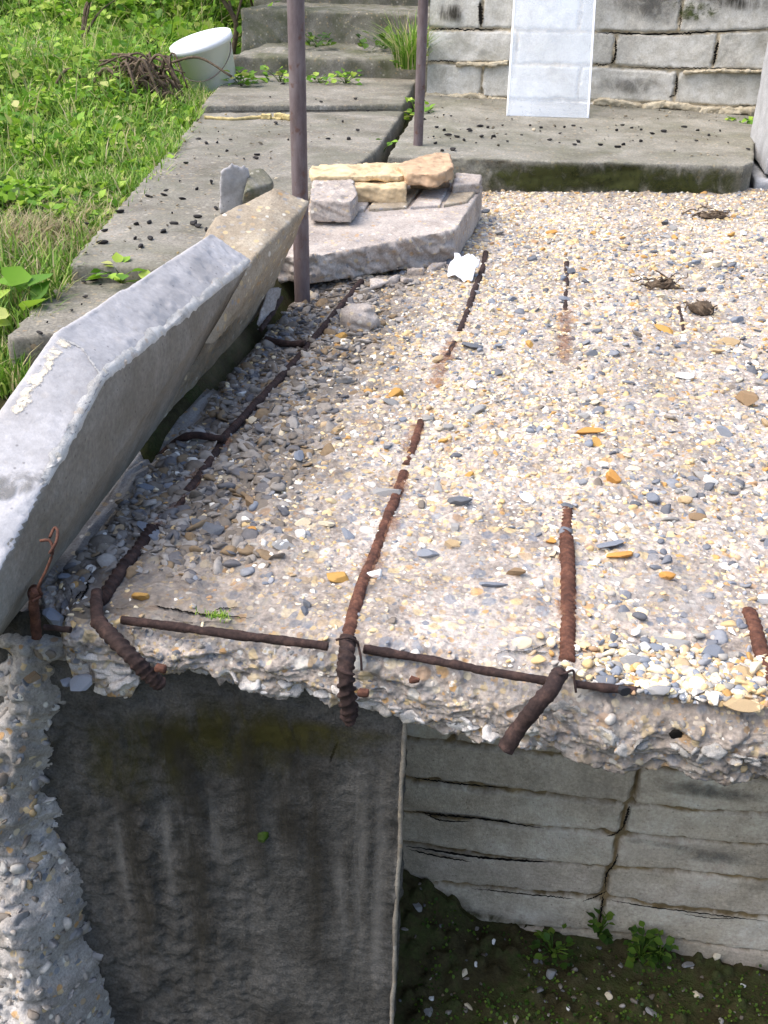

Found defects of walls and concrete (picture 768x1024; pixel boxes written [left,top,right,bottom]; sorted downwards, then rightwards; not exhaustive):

rust [557,309,573,359]
spalling [69,653,140,696]
spalling [225,670,339,699]
spalling [356,701,425,724]
spalling [543,700,588,723]
spalling [446,717,500,744]
spalling [591,726,649,758]
spalling [669,742,762,768]
crack [413,777,505,788]
crack [413,811,540,828]
crack [406,846,551,862]
crack [475,806,762,923]